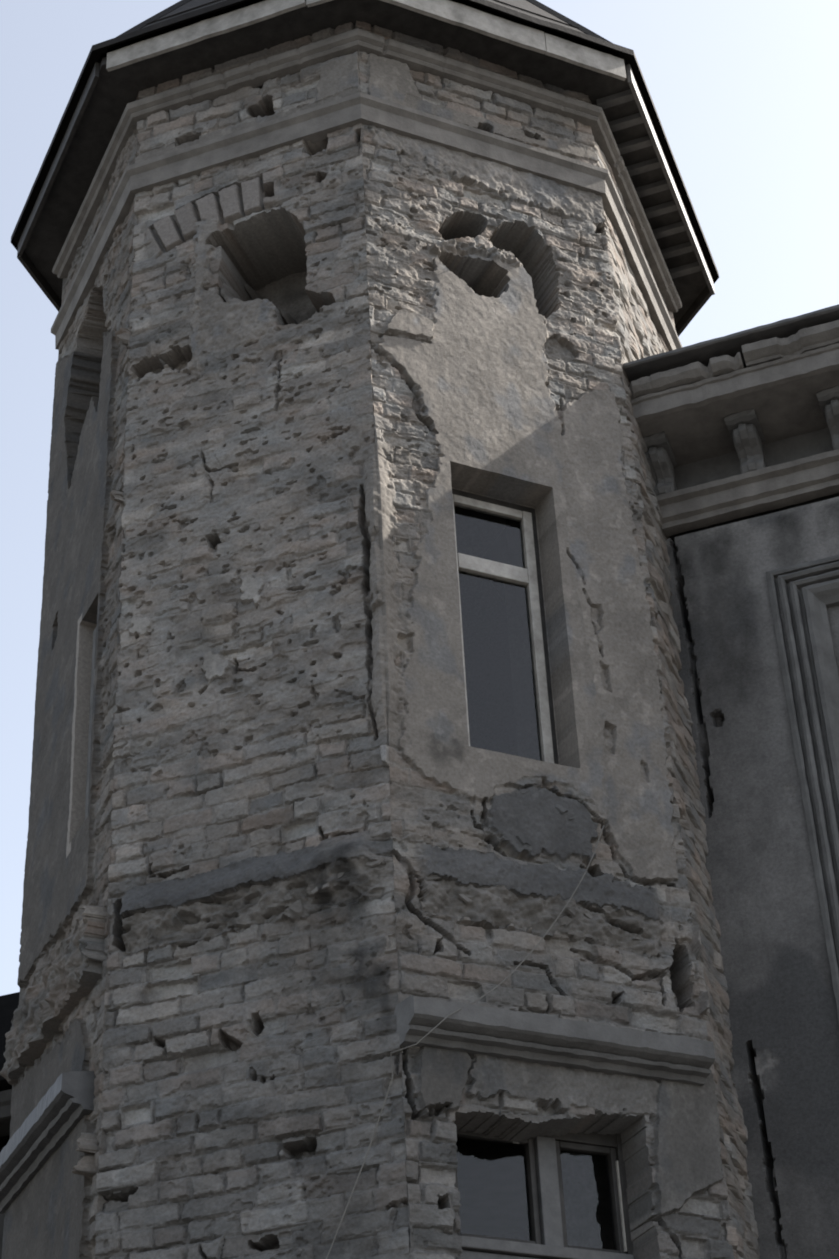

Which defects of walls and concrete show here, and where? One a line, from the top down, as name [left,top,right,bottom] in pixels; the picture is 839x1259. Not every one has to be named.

crack [376,335,431,428]
crack [361,490,379,740]
spalling [121,857,384,959]
spalling [420,875,663,957]